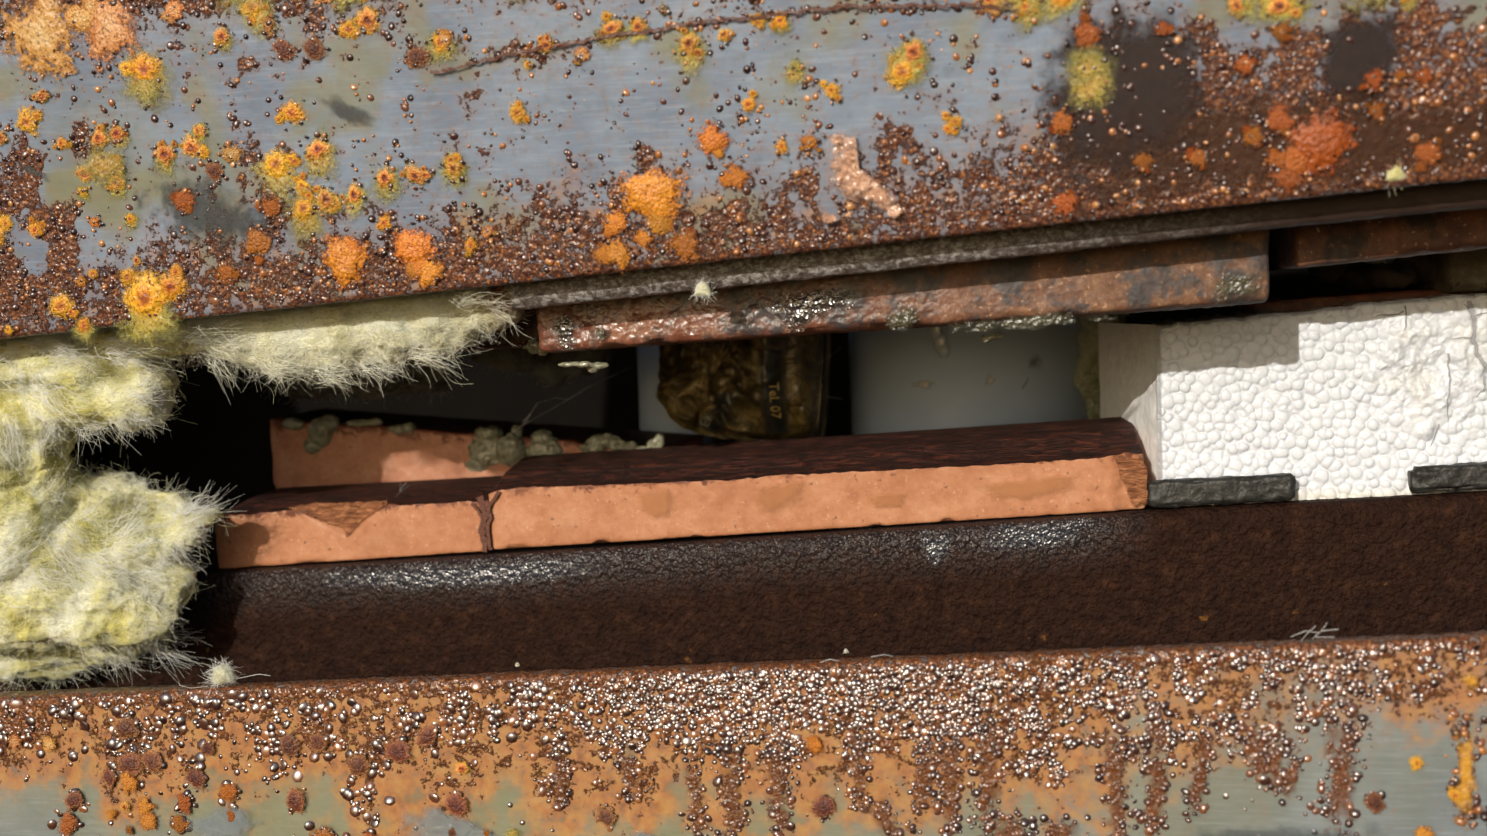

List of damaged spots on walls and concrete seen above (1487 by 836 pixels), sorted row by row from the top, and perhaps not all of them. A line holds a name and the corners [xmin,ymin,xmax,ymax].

rust [0,0,1487,342]
crack [1376,306,1407,331]
crack [1430,301,1487,447]
rust [0,643,1487,836]